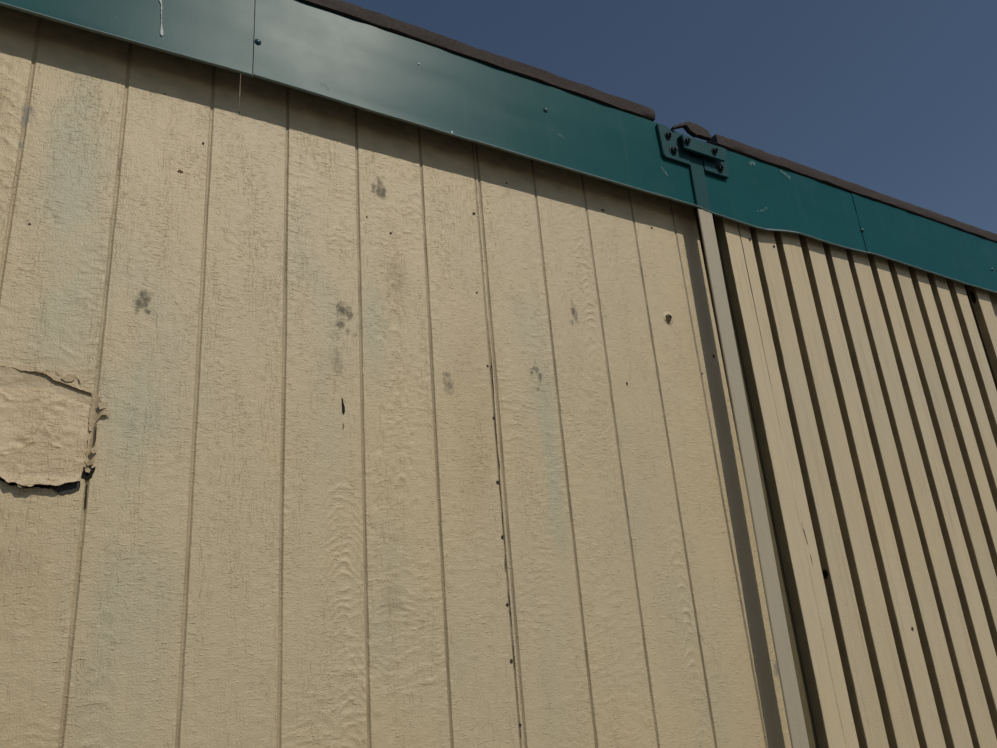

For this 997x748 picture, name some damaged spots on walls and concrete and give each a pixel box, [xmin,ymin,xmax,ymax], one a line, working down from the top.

peeling [0,364,110,494]